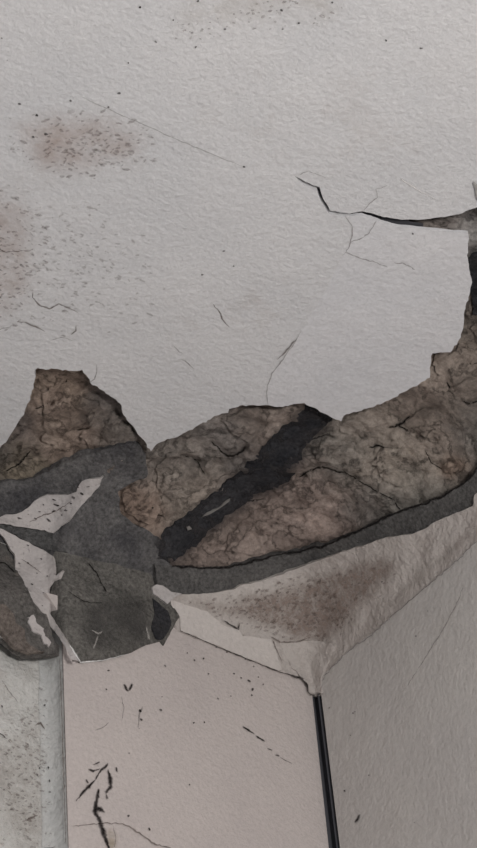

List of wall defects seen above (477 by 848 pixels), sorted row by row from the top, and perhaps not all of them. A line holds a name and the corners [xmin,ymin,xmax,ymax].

crack [344,186,423,269]
spalling [0,208,477,671]
crack [38,659,170,848]